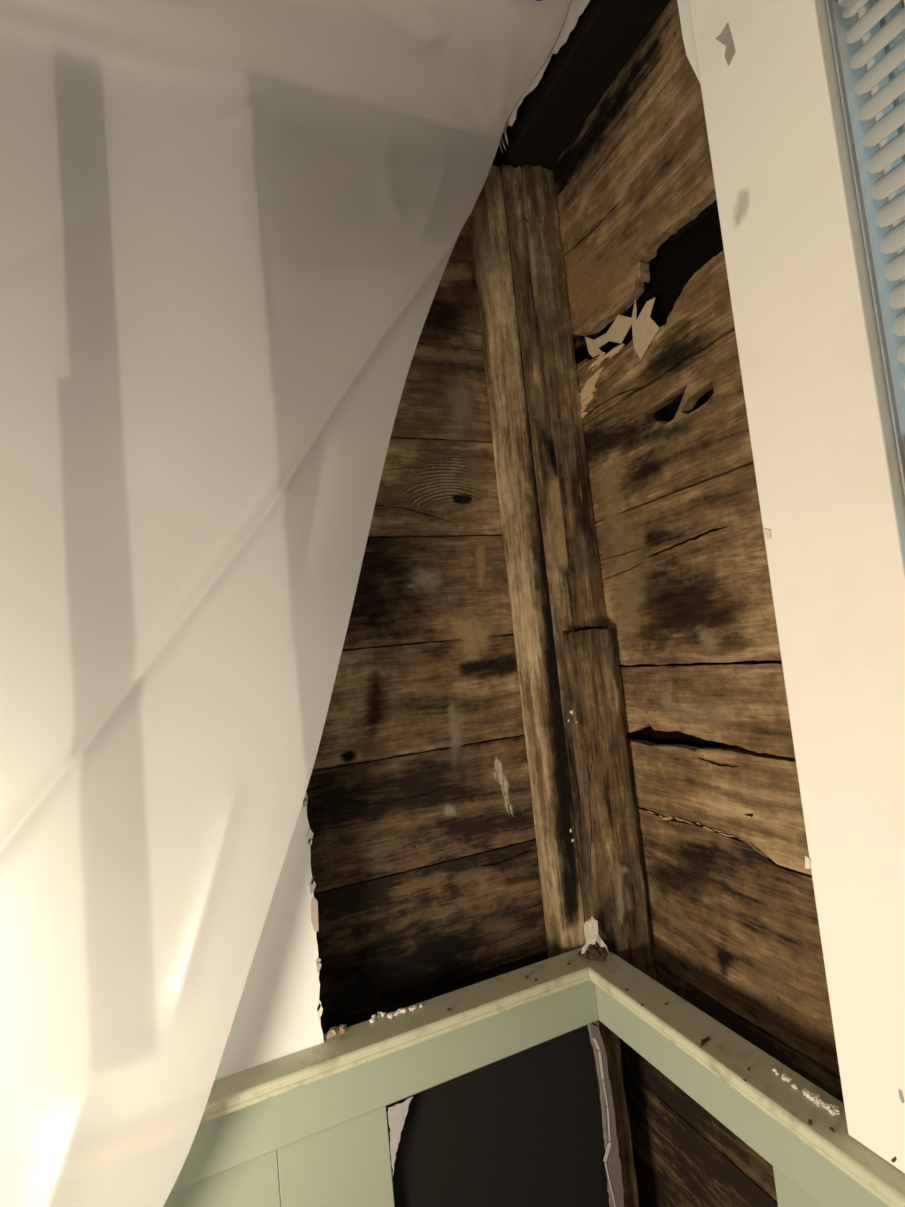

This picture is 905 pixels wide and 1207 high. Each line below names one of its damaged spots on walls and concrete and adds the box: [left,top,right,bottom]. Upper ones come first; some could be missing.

water stain [584,419,733,653]
crack [627,727,758,767]
flaking render [309,876,319,932]
flaking render [581,916,611,959]
flaking render [369,1004,423,1023]
peeling [592,1038,616,1207]